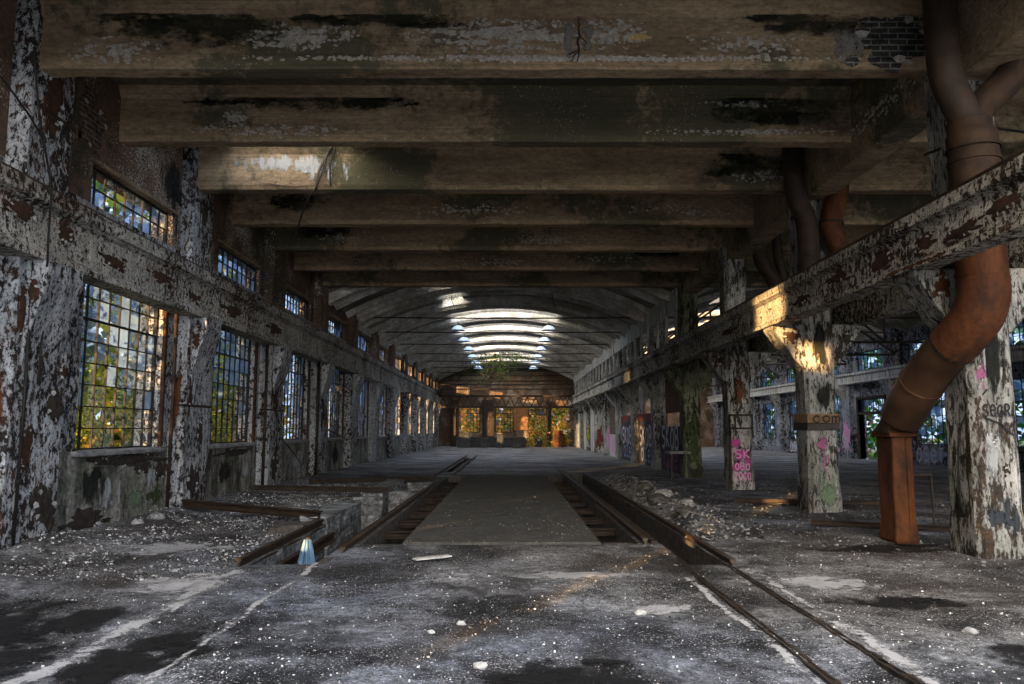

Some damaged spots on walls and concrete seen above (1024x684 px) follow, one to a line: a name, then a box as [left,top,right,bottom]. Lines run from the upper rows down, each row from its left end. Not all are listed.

leakage [67,13,871,66]
crack [567,17,587,62]
spalling [844,15,925,73]
leakage [184,97,419,139]
leakage [646,79,915,139]
leakage [707,153,783,183]
peeling [912,192,1021,258]
peeling [98,251,128,273]
peeling [17,276,40,343]
peeling [36,358,70,423]
peeling [186,329,252,500]
peeling [29,482,111,531]